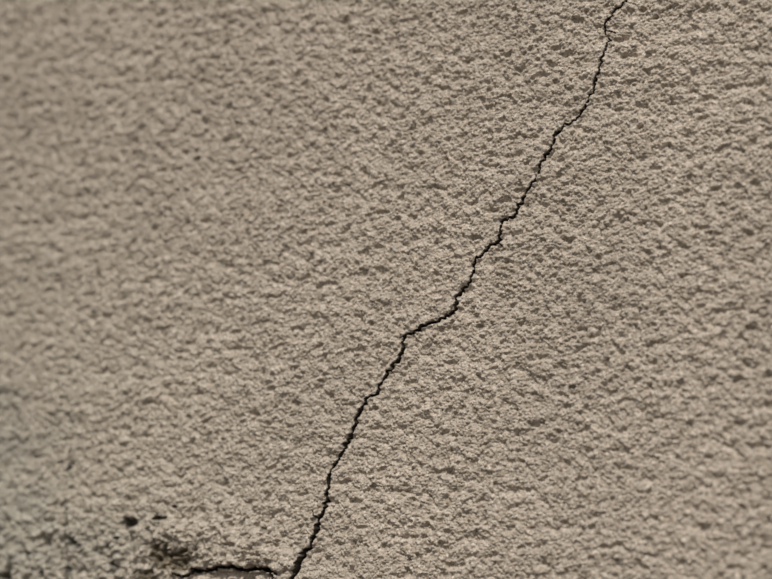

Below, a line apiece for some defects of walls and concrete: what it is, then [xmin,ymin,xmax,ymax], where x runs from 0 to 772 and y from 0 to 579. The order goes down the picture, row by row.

crack [171,0,628,579]